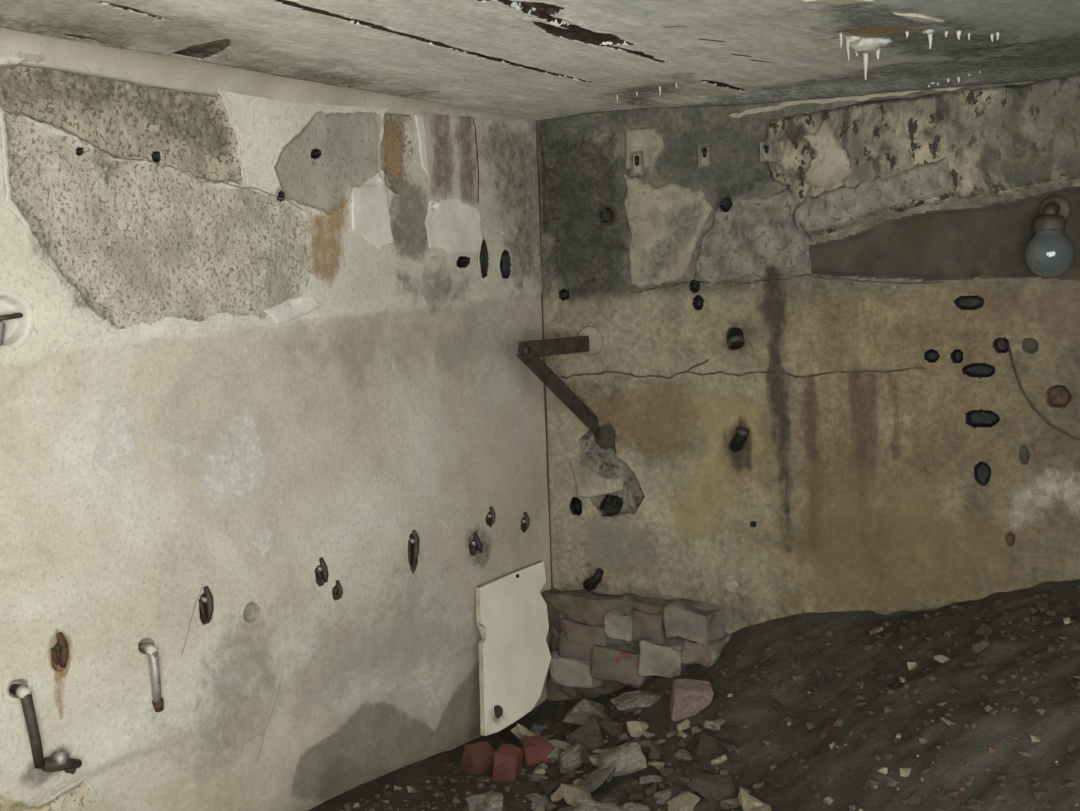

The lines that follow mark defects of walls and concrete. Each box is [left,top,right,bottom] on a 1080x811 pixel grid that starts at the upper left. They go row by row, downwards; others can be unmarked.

spalling [269,0,598,83]
spalling [470,0,669,63]
water stain [686,4,1080,182]
flaking render [0,56,430,333]
flaking render [424,198,483,254]
flaking render [623,76,1080,288]
crack [560,359,927,379]
corrosion [49,632,70,700]
flaking render [0,776,110,811]